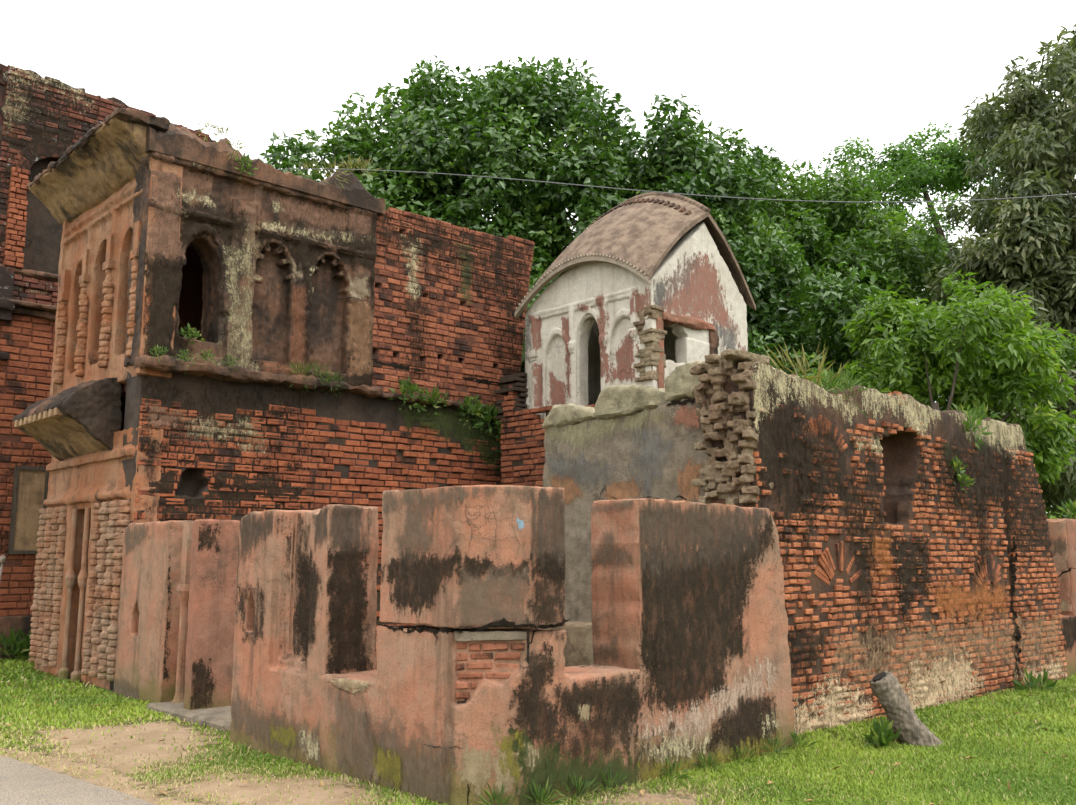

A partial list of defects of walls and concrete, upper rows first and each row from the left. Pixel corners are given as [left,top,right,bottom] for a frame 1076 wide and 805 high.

damp [142,197,533,387]
peeling [528,315,542,350]
peeling [532,251,747,407]
damp [653,280,667,306]
damp [190,655,215,710]
damp [124,375,373,680]
damp [230,689,405,791]
flaking render [454,630,530,703]
damp [381,370,1076,805]
crack [1010,527,1022,681]